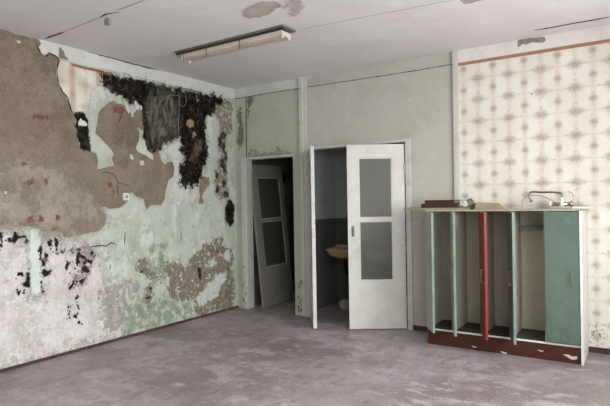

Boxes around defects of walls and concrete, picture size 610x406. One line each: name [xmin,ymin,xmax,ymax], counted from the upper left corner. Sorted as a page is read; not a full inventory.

flaking render [518,37,546,47]
flaking render [0,29,235,369]
leakage [99,72,255,227]